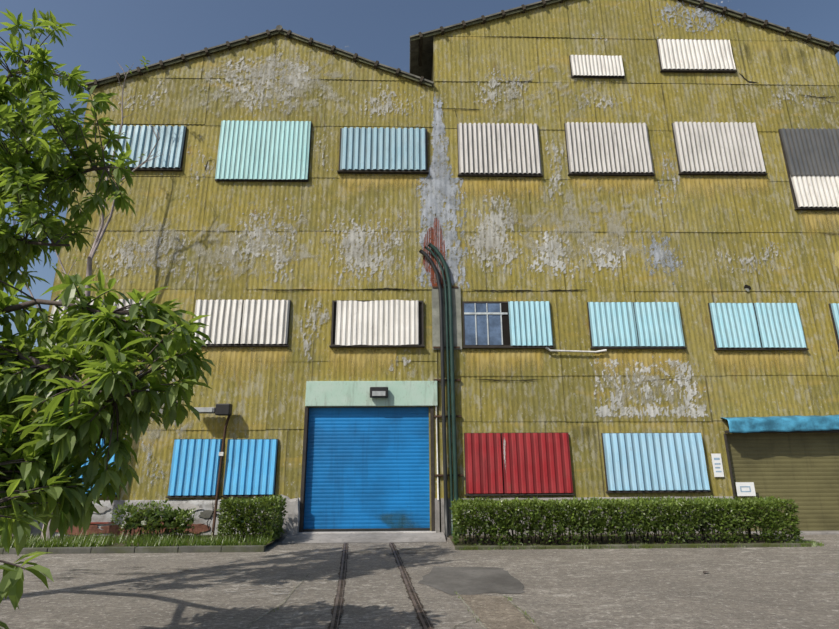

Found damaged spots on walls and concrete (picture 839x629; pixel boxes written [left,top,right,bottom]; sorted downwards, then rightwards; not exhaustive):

peeling [110,81,167,111]
peeling [197,53,352,116]
peeling [474,66,540,115]
peeling [318,83,688,288]
peeling [95,198,311,286]
rust [423,218,447,286]
peeling [591,356,712,421]